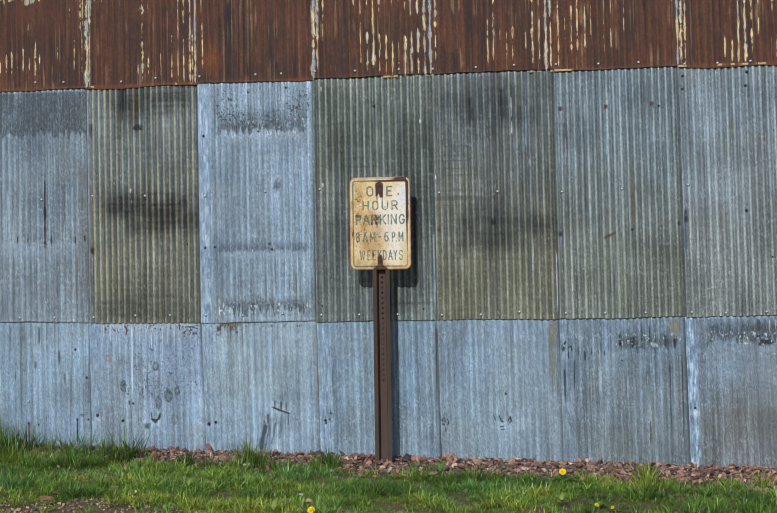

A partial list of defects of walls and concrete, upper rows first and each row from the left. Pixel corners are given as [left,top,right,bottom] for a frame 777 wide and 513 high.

peeling [310,0,324,80]
rust [0,0,777,92]
peeling [352,0,437,78]
peeling [486,0,515,64]
peeling [525,0,592,72]
leakage [0,92,86,139]
leakage [109,195,187,233]
leakage [215,300,313,317]
leakage [616,320,681,349]
leakage [705,320,777,345]